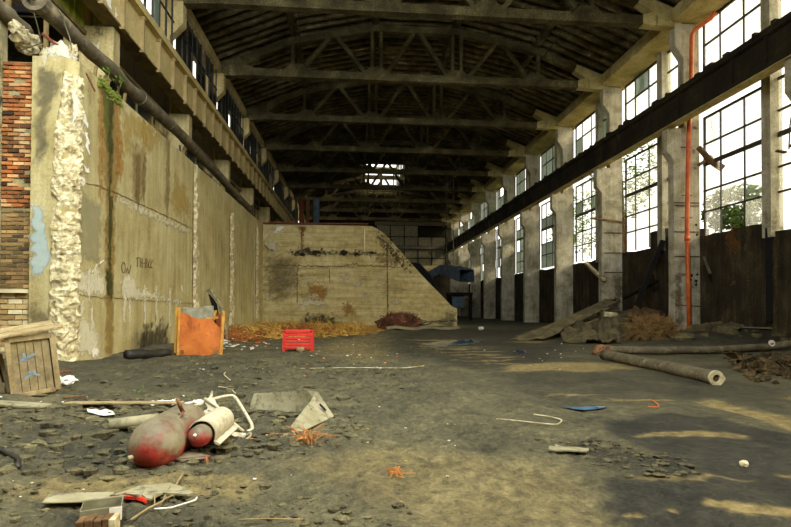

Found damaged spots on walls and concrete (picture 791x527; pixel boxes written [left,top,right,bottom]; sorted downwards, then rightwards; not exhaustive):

spalling [48,71,90,362]
leakage [75,87,181,359]